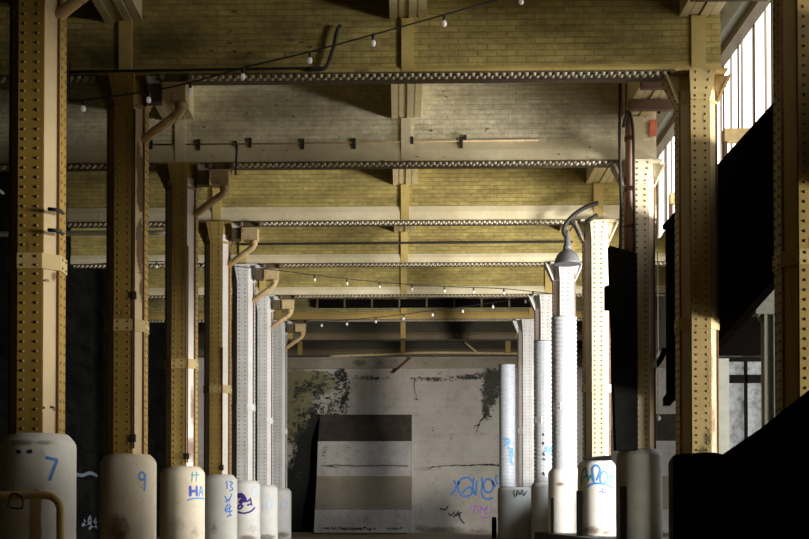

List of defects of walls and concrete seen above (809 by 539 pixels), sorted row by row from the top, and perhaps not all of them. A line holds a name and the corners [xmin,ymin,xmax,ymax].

water stain [287,369,350,456]